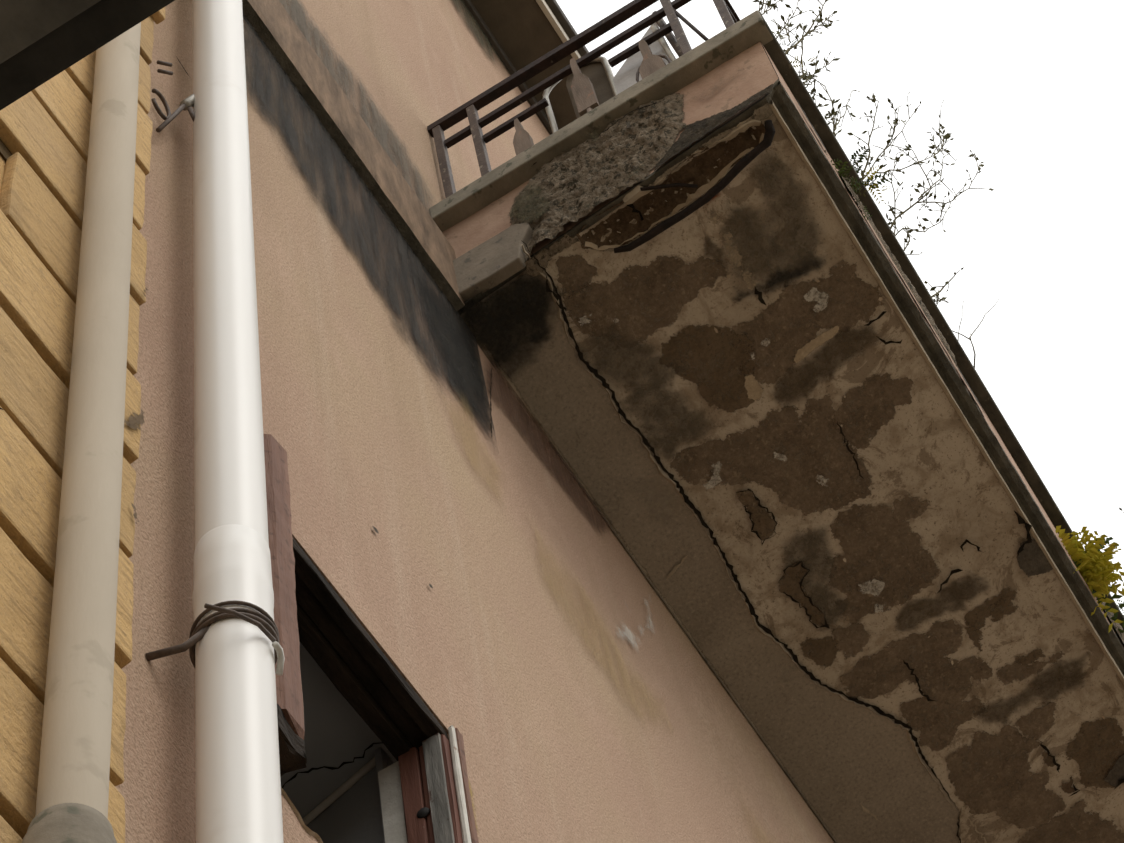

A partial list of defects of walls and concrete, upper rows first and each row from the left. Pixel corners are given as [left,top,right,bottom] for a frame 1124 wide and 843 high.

damp [243,0,556,432]
spalling [466,79,884,413]
spalling [842,177,987,417]
crack [282,742,383,789]
crack [521,240,987,843]
peeling [670,373,1124,843]